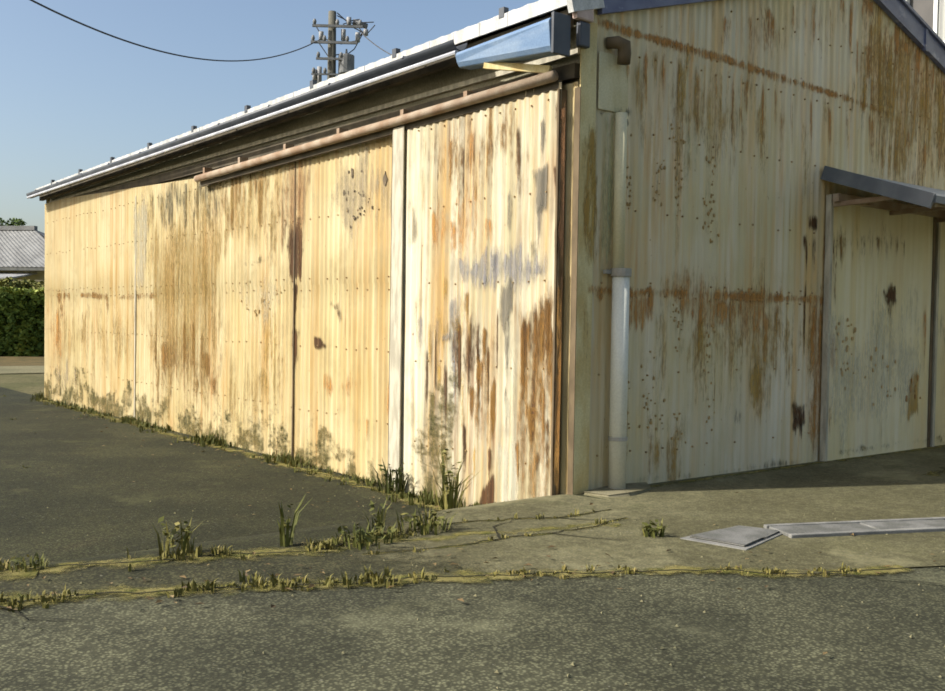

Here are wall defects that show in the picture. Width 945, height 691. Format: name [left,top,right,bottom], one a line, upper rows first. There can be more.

rust [598,0,945,169]
rust [281,161,308,308]
rust [515,293,562,498]
rust [629,287,654,330]
rust [666,275,835,439]
rust [883,286,896,316]
rust [905,375,921,420]
crack [0,509,940,621]